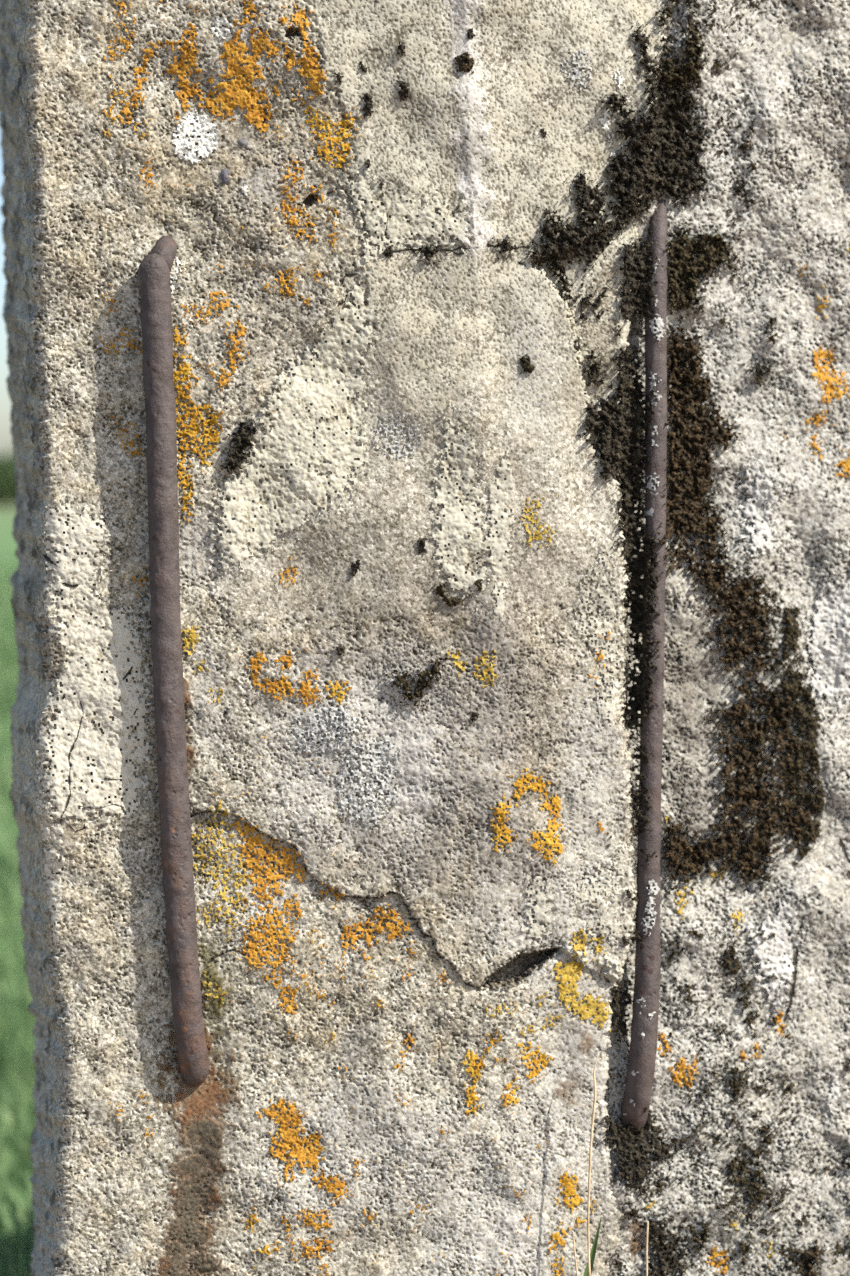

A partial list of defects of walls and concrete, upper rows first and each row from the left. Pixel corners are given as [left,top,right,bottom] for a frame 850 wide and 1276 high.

corrosion [183,677,198,775]
crack [190,811,479,988]
corrosion [151,1024,243,1276]